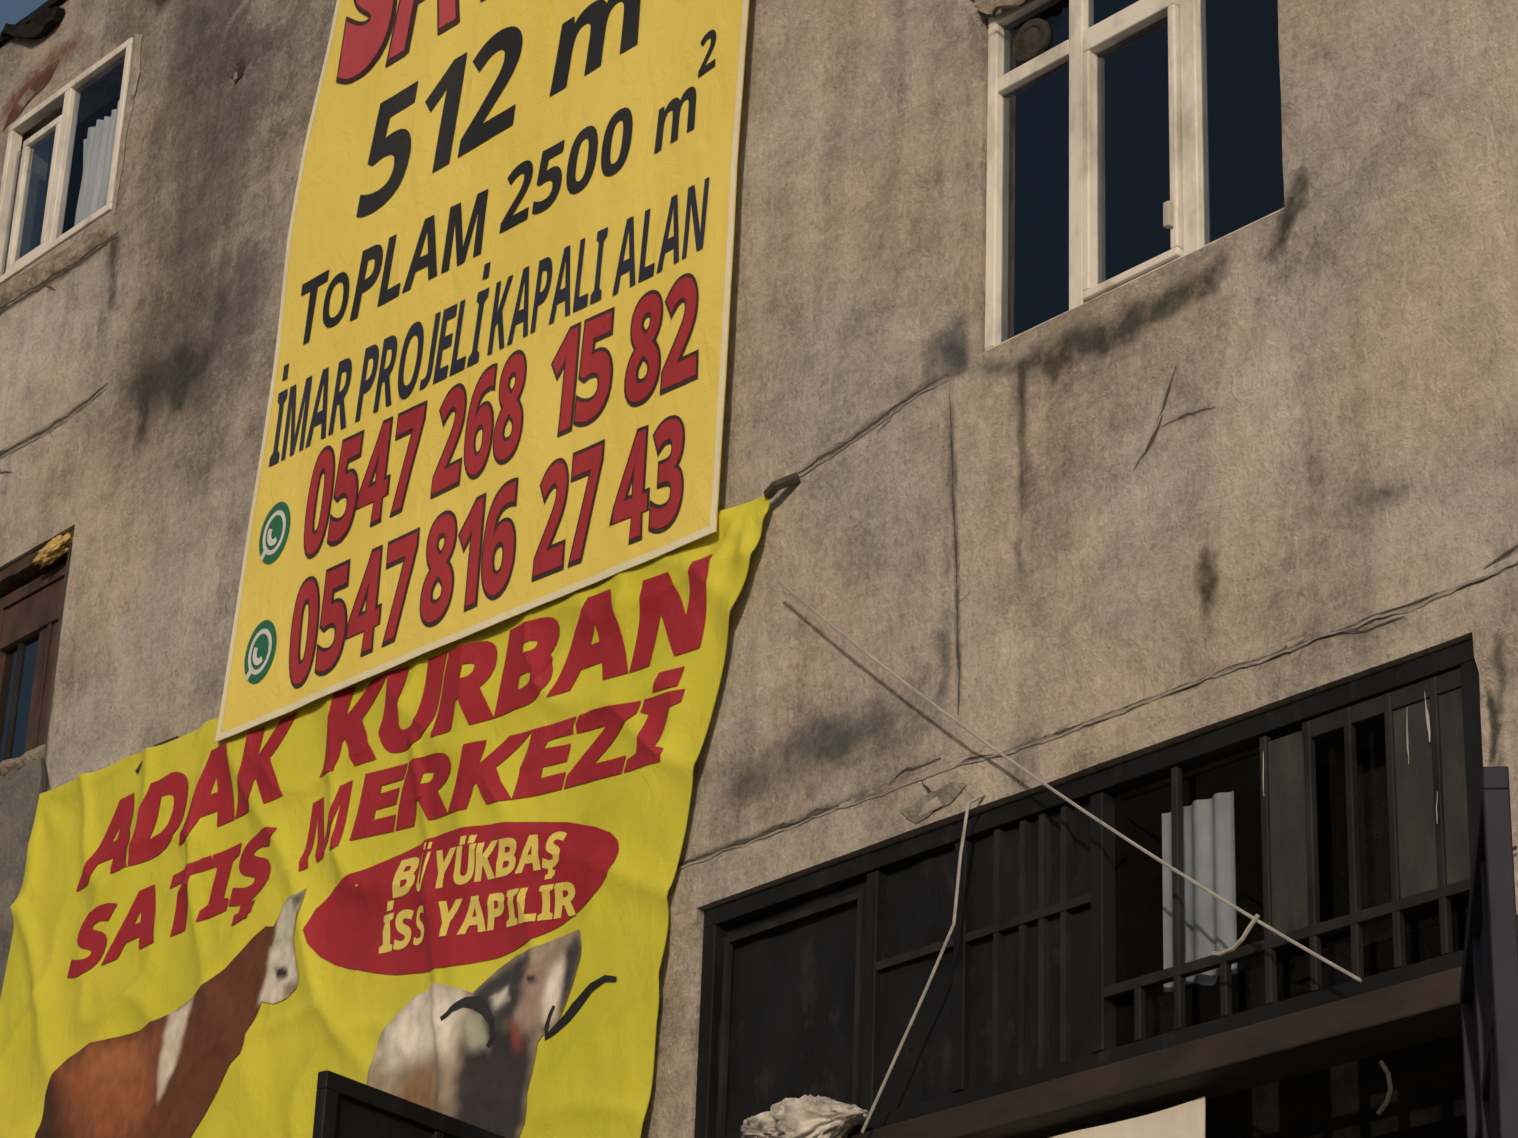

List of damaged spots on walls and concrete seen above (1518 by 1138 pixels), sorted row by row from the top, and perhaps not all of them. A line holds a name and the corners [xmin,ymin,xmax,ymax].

flaking render [973,0,1025,14]
flaking render [2,60,59,131]
water stain [1019,269,1216,401]
crack [0,384,107,474]
crack [1133,367,1216,471]
crack [799,375,971,715]
crack [677,545,1518,869]